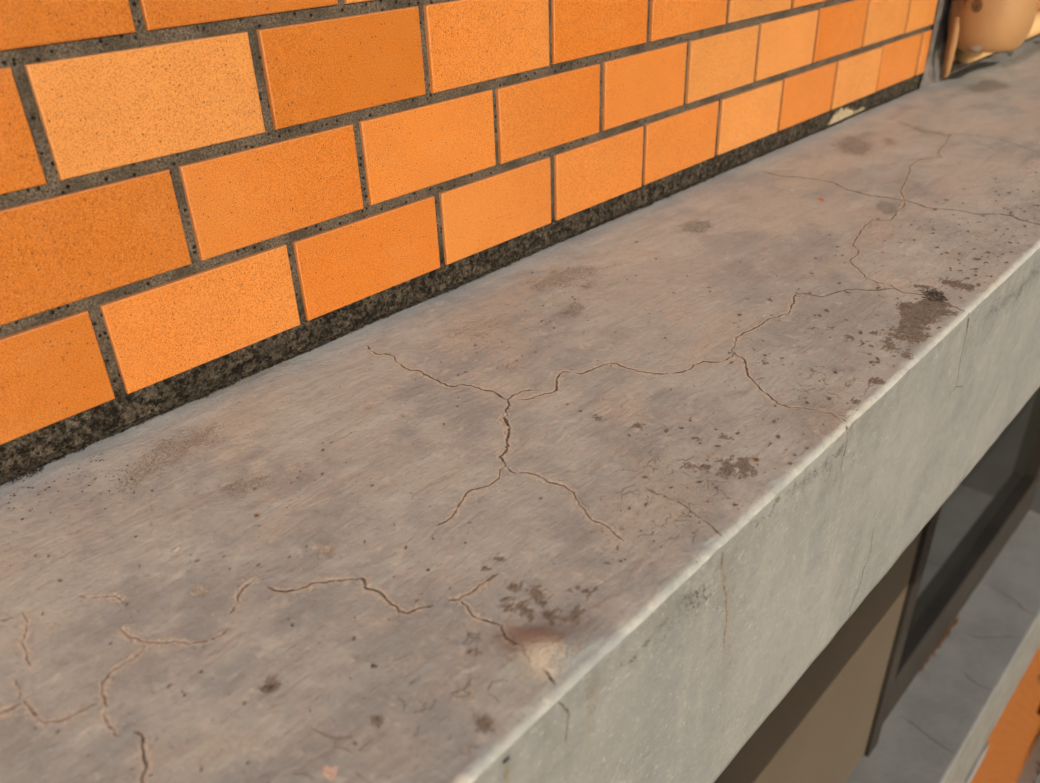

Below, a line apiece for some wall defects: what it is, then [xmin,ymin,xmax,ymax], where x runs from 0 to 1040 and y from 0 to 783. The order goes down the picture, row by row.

peeling [807,177,1040,387]
crack [361,134,1040,647]
crack [0,569,570,783]